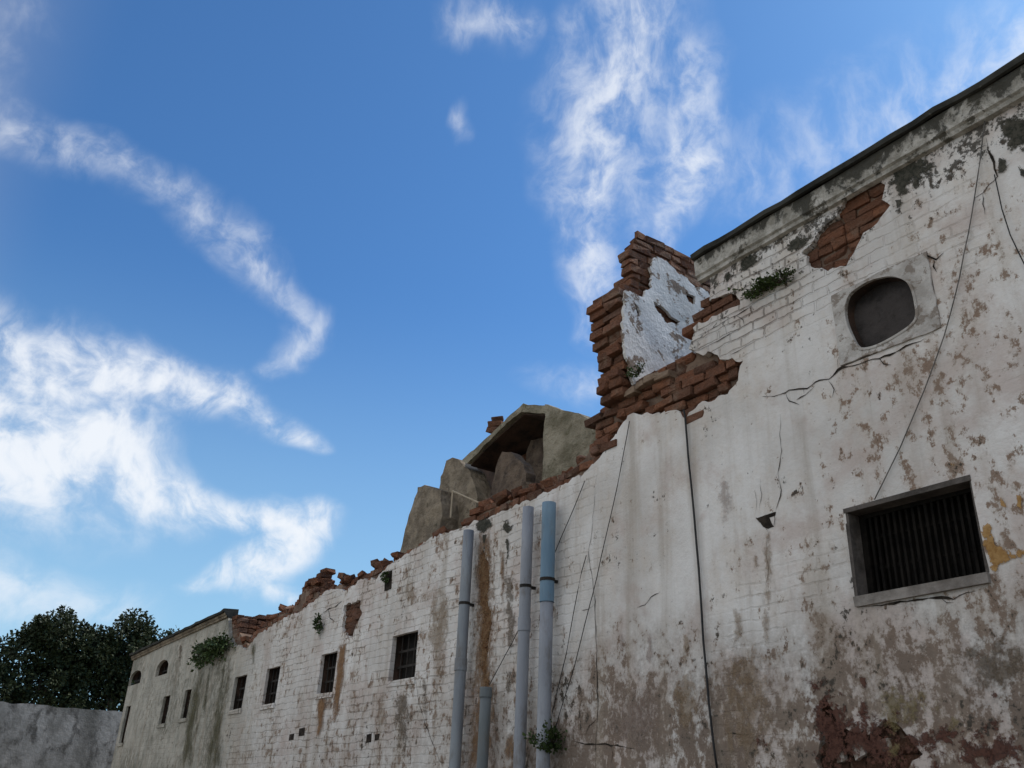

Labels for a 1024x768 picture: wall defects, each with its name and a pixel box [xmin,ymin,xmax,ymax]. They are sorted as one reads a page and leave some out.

damp [889,158,936,208]
crack [974,139,1008,212]
damp [998,111,1024,177]
flaking render [807,182,890,271]
flaking render [584,294,742,464]
crack [755,340,922,514]
flaking render [981,523,1024,572]
flaking render [345,601,362,637]
damp [959,635,1024,689]
damp [183,670,229,765]
peeling [803,679,1024,768]